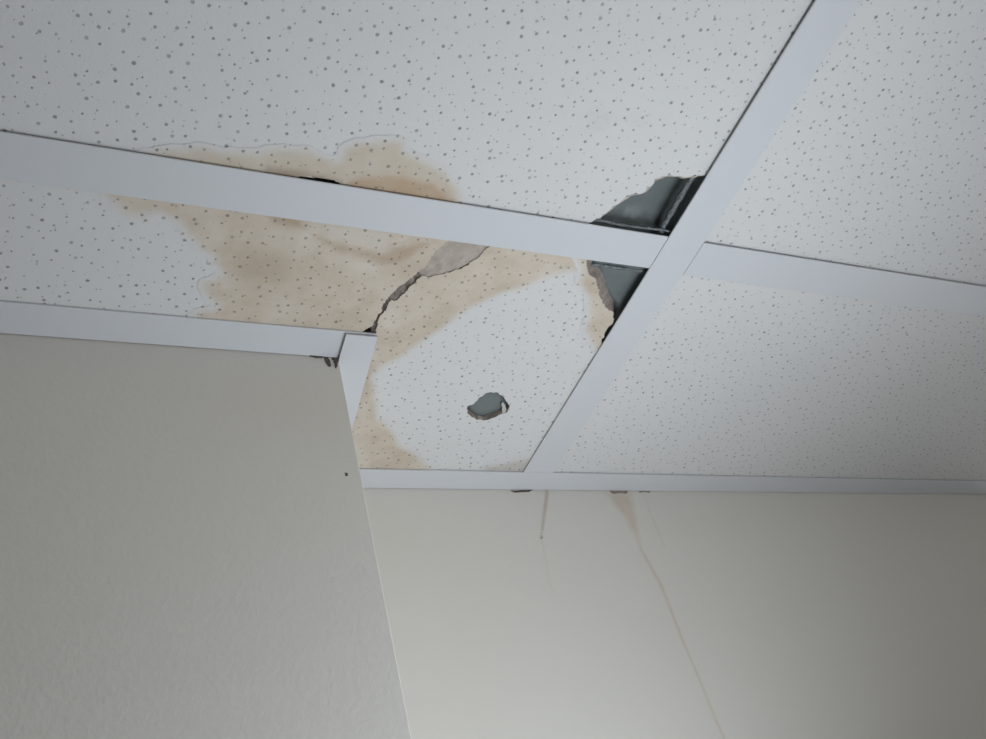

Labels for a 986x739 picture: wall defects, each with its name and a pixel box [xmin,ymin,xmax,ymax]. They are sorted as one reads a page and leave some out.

leakage [134,135,467,204]
spalling [586,260,614,312]
leakage [99,193,614,472]